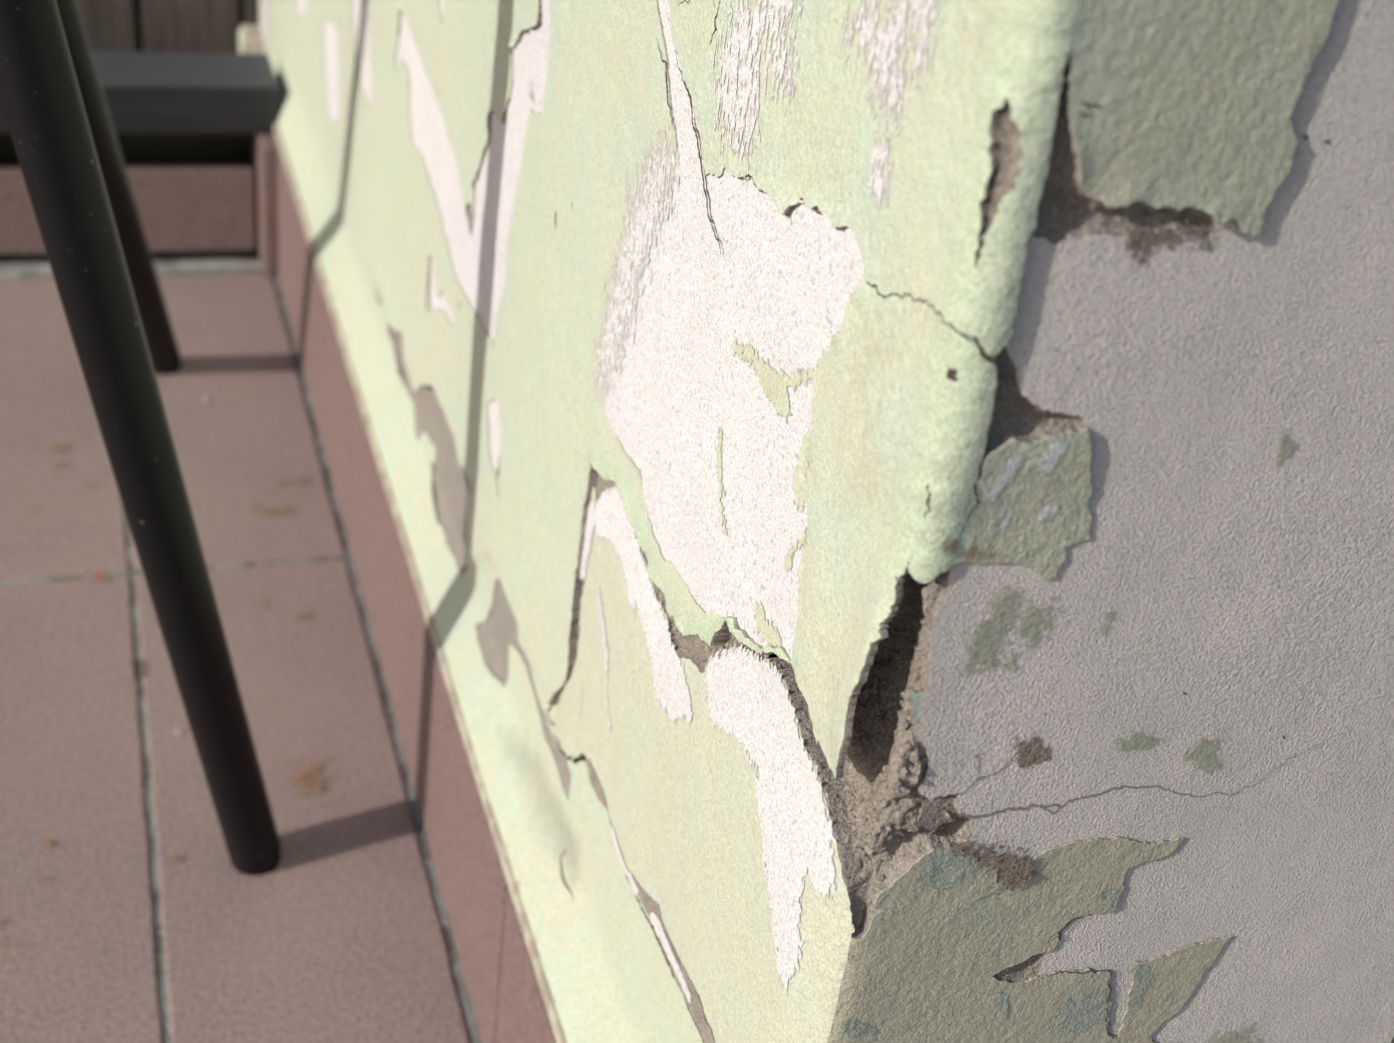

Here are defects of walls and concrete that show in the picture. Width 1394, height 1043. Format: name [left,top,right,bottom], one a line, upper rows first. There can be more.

peeling [395,0,550,340]
flaking render [987,109,1022,232]
flaking render [1031,66,1214,244]
flaking render [388,326,468,574]
peeling [602,0,865,673]
crack [867,281,1005,363]
flaking render [984,346,1085,451]
flaking render [477,580,571,798]
flaking render [839,573,982,935]
crack [958,730,1352,819]
crack [625,872,704,1043]
flaking render [993,953,1045,982]